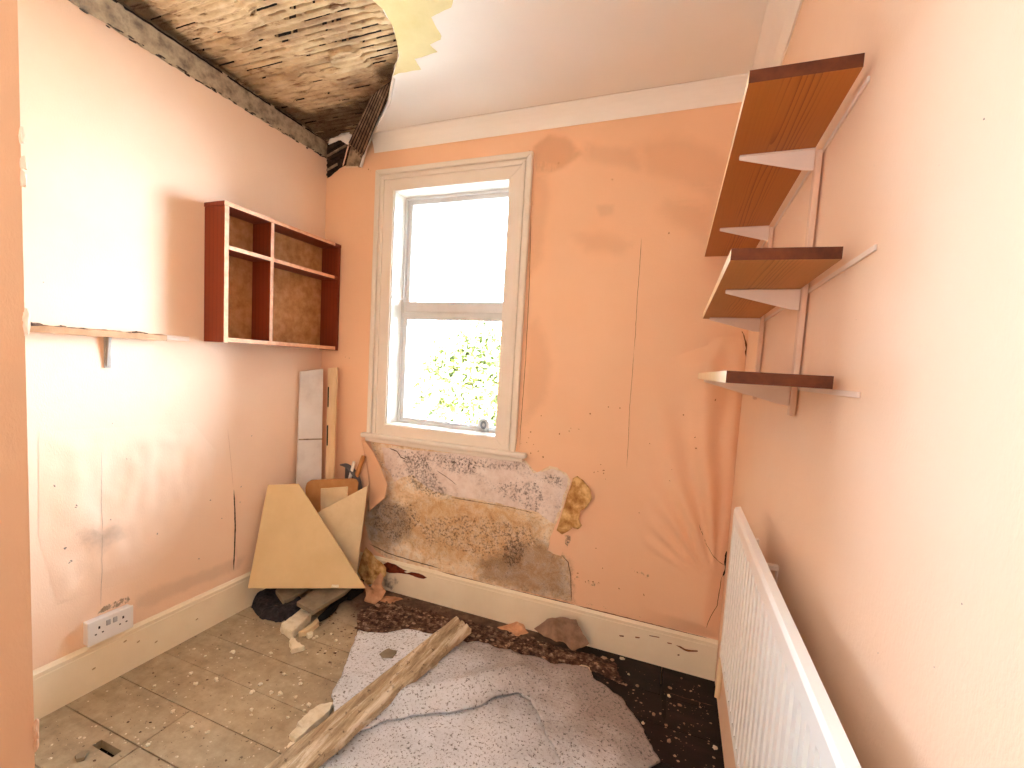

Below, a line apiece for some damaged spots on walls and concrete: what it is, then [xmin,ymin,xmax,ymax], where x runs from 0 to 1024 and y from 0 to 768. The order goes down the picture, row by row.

spalling [155,54,326,158]
peeling [362,440,592,602]